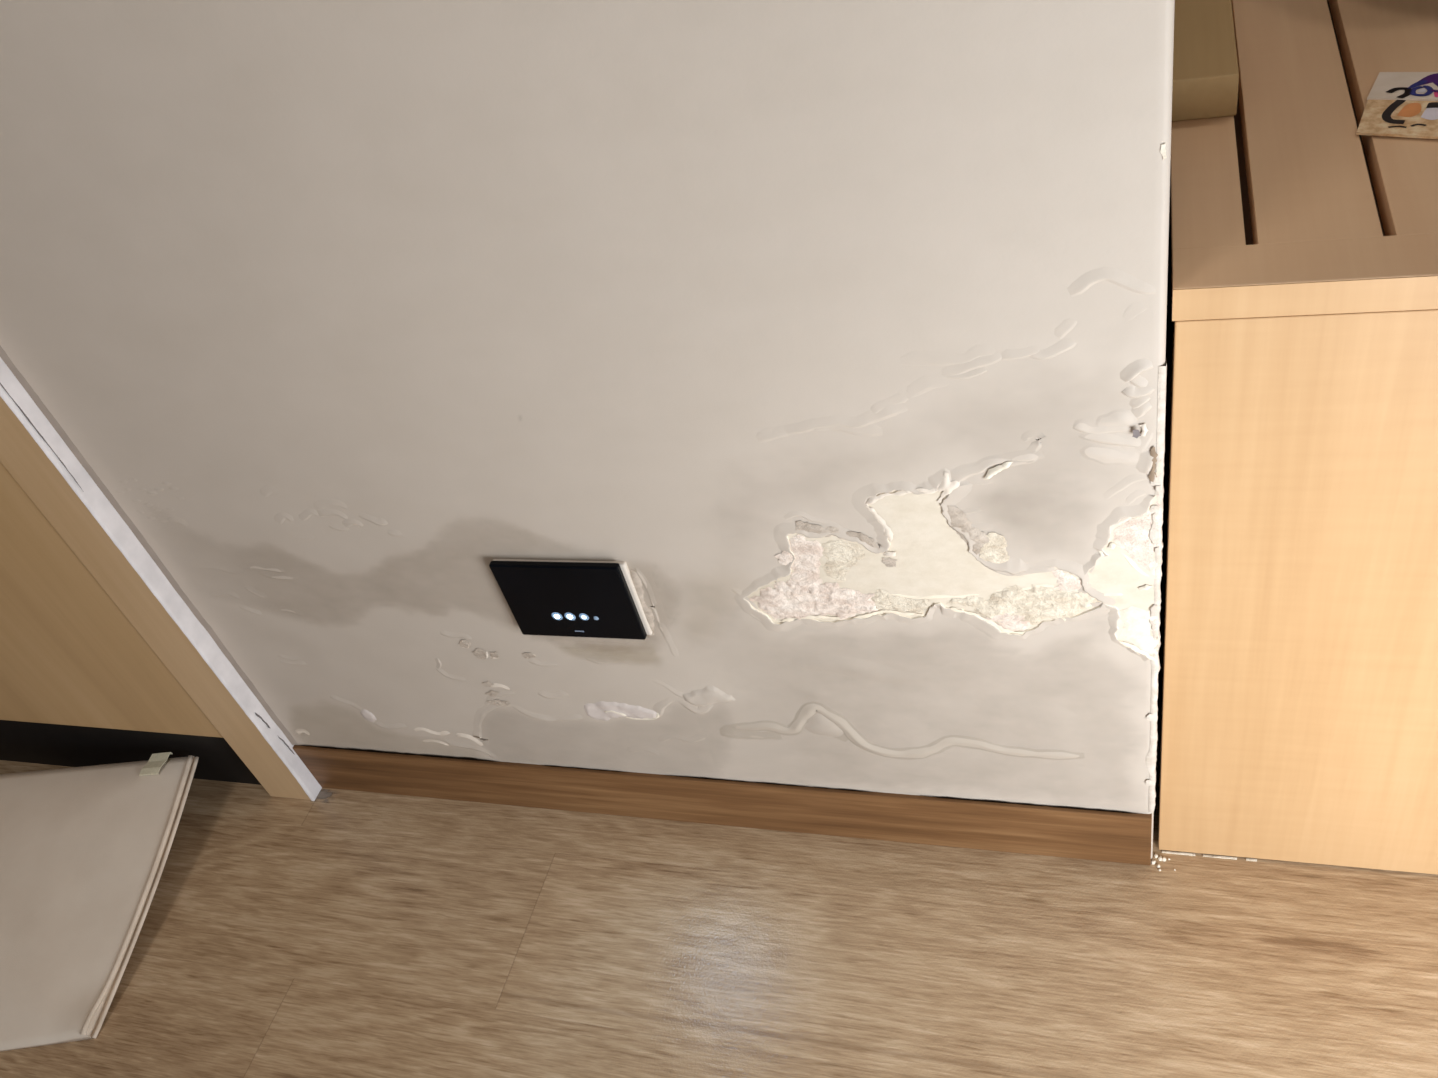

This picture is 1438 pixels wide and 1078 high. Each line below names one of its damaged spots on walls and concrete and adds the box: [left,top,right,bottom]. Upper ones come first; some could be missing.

peeling [732,360,1167,812]